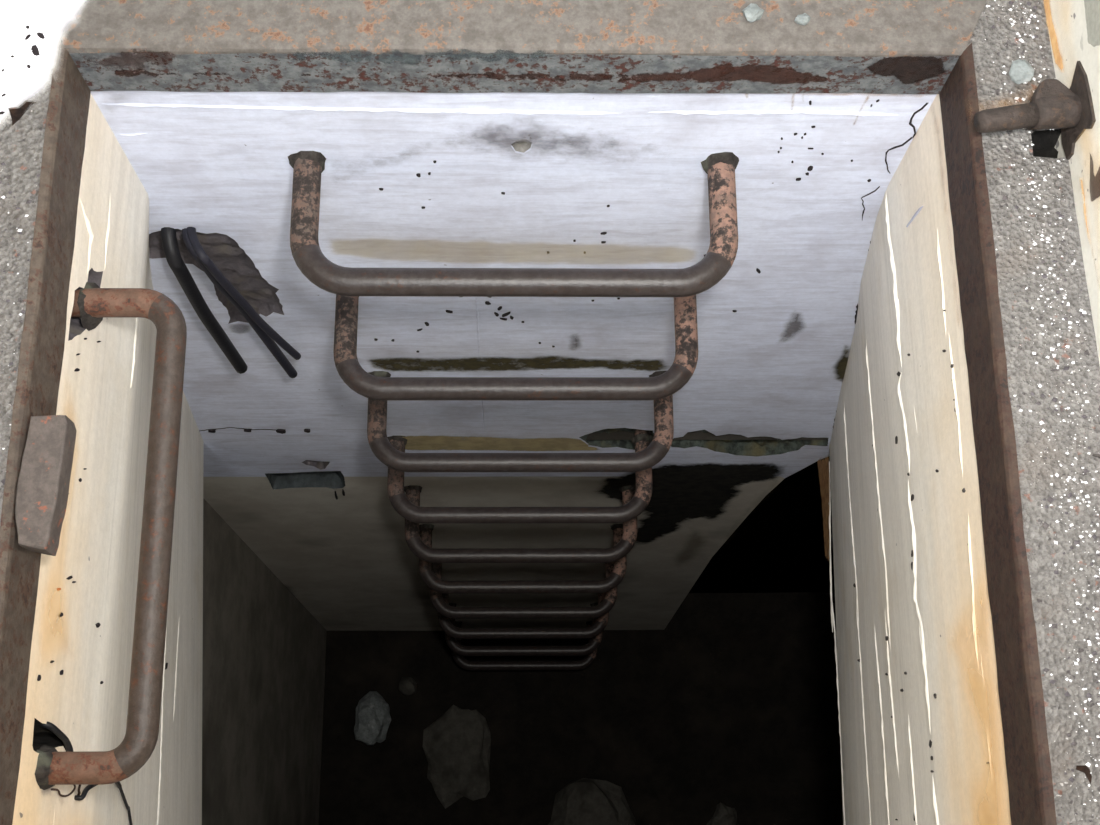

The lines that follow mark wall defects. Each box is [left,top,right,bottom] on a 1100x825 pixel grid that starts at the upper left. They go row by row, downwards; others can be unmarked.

peeling [1084,0,1100,47]
corrosion [108,53,175,77]
corrosion [292,49,827,85]
spalling [579,428,635,450]
spalling [671,430,828,456]